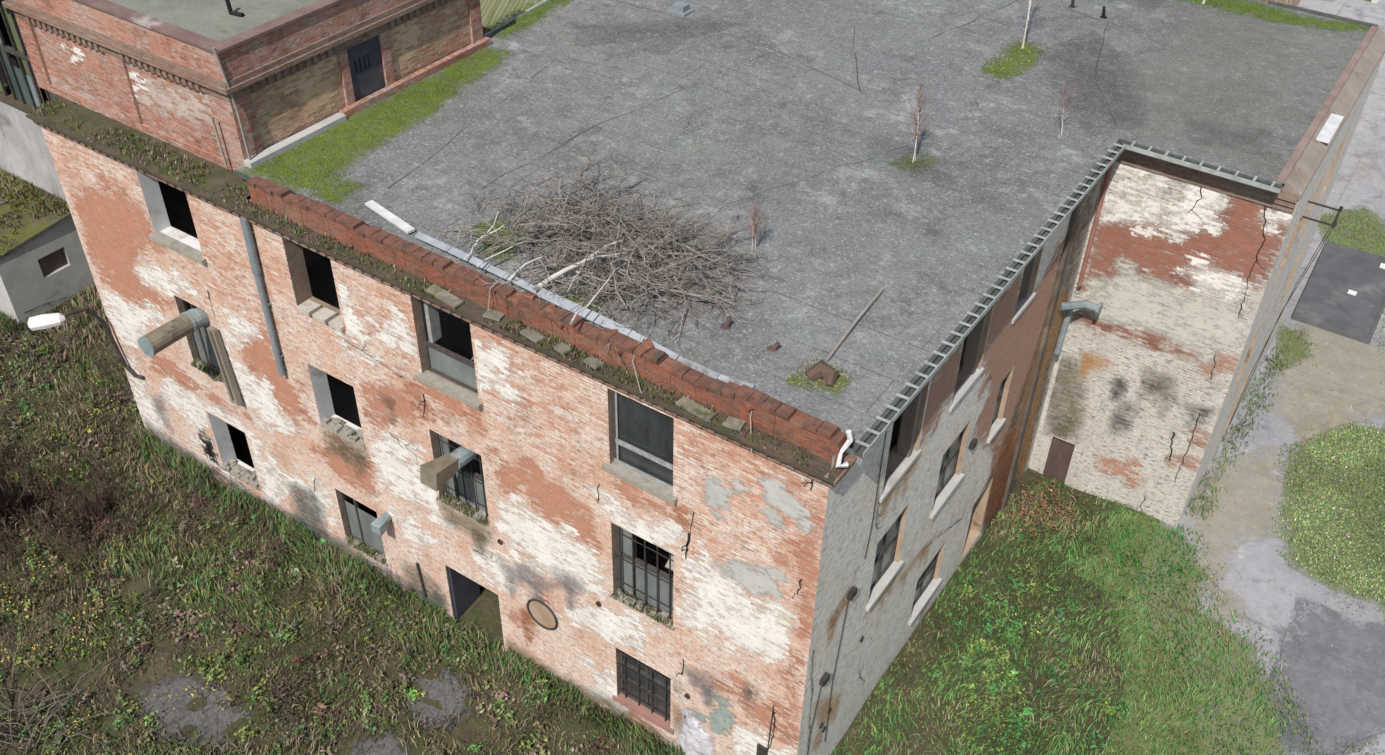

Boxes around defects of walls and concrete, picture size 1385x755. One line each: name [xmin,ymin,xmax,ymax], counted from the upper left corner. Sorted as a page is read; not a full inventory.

peeling [48,44,94,99]
peeling [129,63,211,124]
flaking render [1075,163,1293,375]
crack [1238,205,1270,319]
flaking render [72,172,825,755]
crack [1164,413,1202,481]